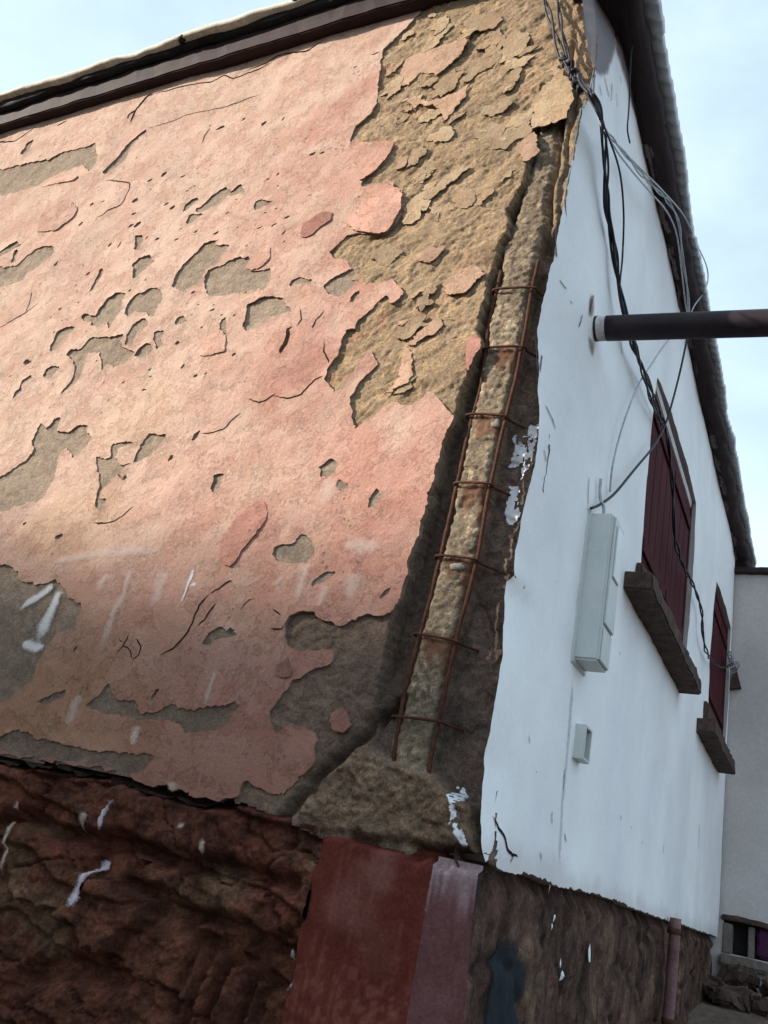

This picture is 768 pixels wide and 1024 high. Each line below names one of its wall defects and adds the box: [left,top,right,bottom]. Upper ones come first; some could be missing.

crack [127,41,322,144]
spalling [324,0,598,427]
peeling [51,199,291,392]
corrosion [476,415,503,439]
corrosion [463,484,488,511]
leakage [22,584,53,608]
corrosion [447,557,473,596]
leakage [23,640,43,652]
peeling [0,565,82,702]
crack [0,756,237,807]
crack [493,816,518,862]
leakage [68,860,111,905]